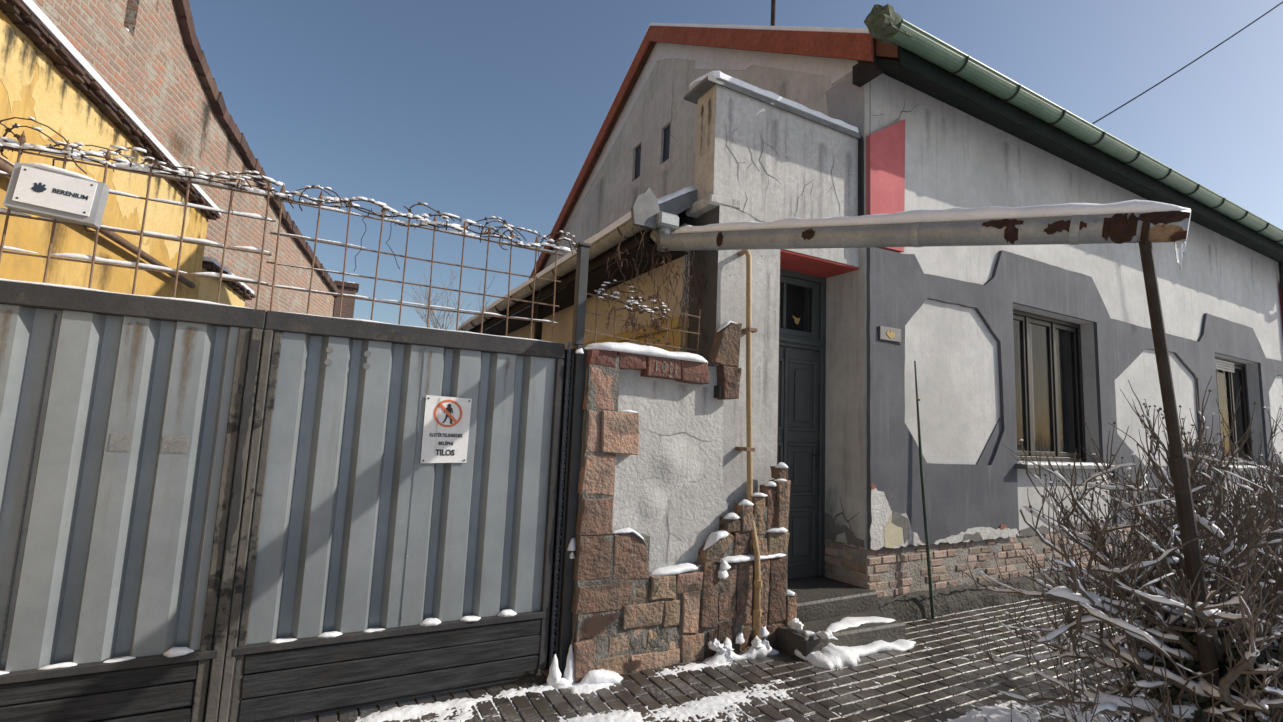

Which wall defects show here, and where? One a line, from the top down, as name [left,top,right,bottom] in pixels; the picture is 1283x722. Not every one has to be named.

peeling [0,19,191,262]
crack [725,123,840,223]
rust [982,219,1024,244]
rust [1044,210,1190,244]
peeling [824,483,1059,550]